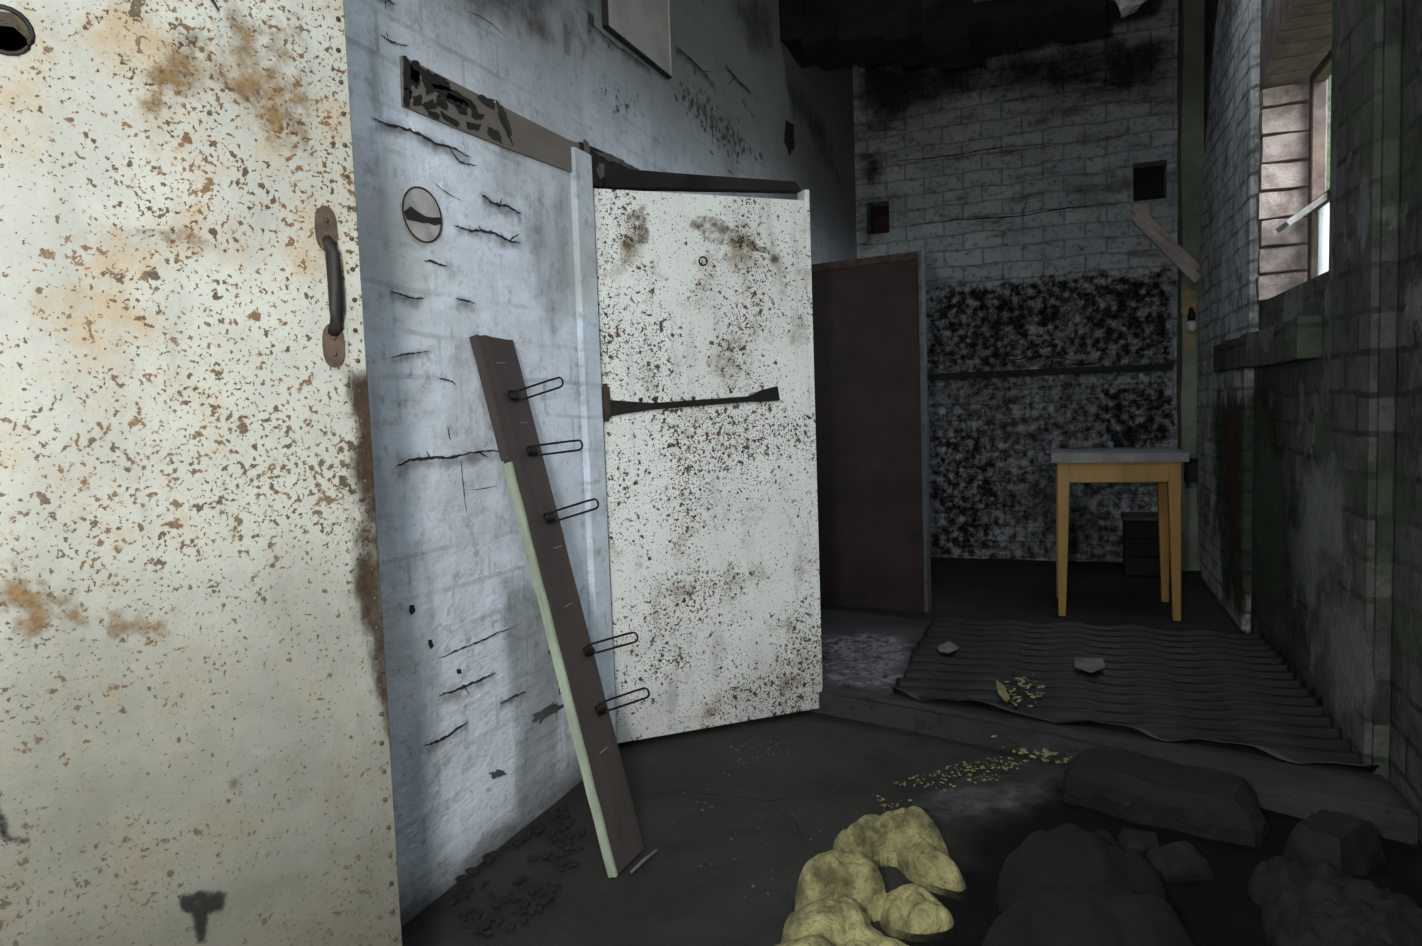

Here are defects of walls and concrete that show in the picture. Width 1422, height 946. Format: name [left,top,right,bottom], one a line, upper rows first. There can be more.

rust [231,22,261,56]
rust [143,48,197,110]
rust [220,69,308,139]
crack [371,117,522,243]
rust [624,206,648,248]
rust [691,217,779,263]
crack [391,259,477,305]
crack [390,351,456,385]
crack [397,429,498,512]
rust [4,580,83,635]
crack [424,625,527,747]